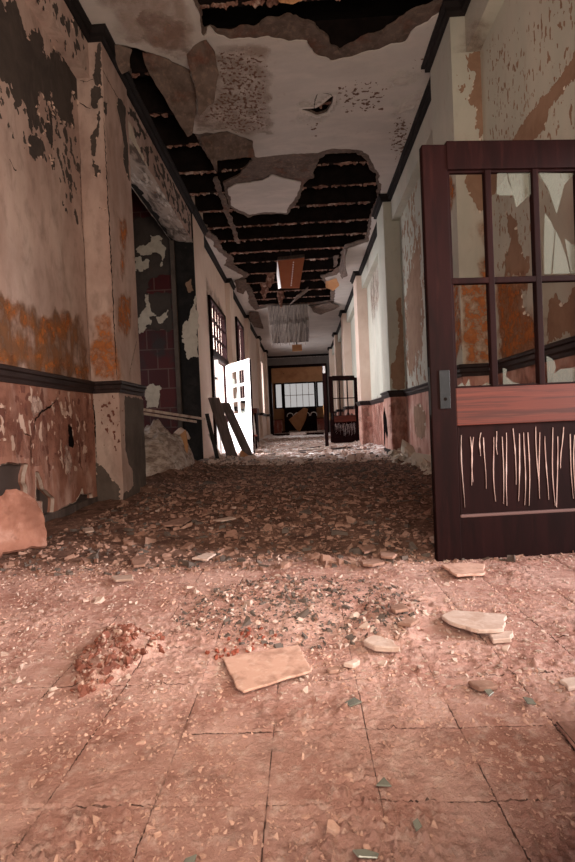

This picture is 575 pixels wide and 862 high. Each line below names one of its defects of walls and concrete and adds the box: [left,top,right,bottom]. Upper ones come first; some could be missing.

peeling [0,0,191,234]
peeling [457,0,575,141]
rust [5,295,131,378]
peeling [133,216,199,360]
peeling [390,185,426,390]
crack [24,401,56,457]
flaking render [0,384,162,514]